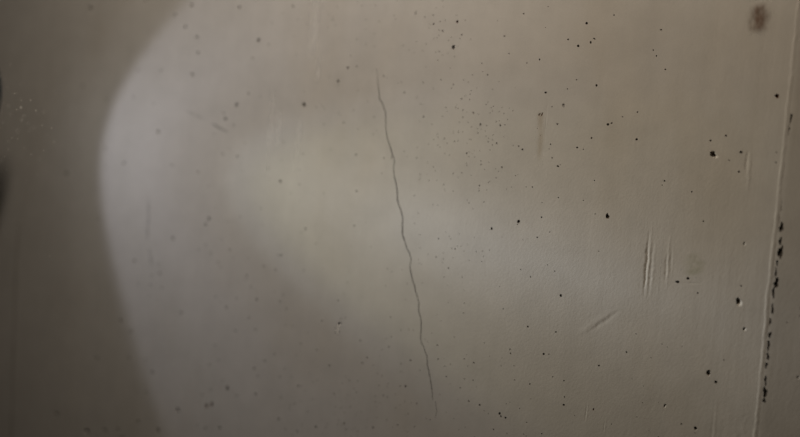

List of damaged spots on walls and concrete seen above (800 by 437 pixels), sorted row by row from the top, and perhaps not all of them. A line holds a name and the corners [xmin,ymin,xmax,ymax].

crack [376,69,437,417]